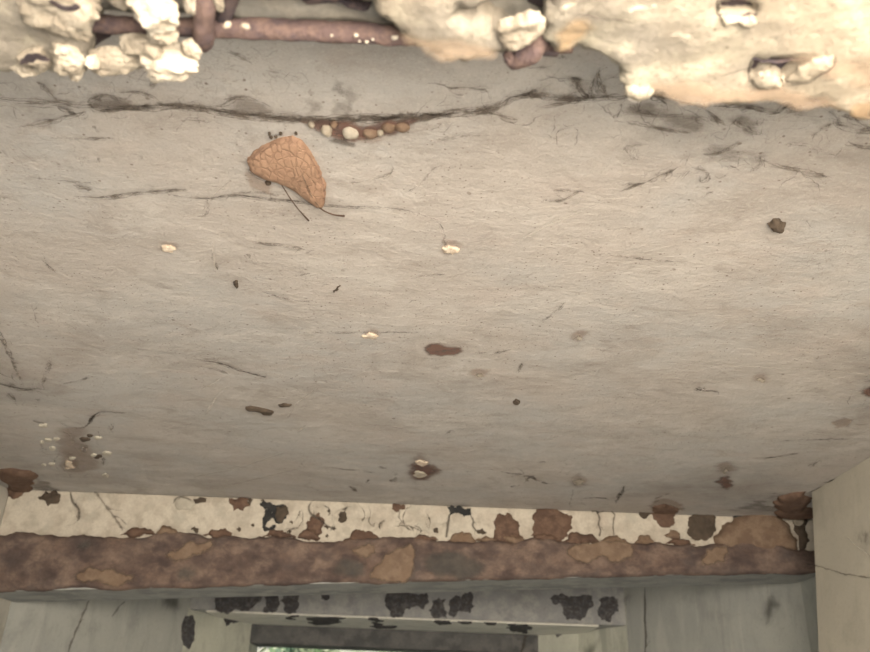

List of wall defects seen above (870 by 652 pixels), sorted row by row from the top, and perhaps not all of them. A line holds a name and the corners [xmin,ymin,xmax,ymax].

spalling [9,0,418,83]
spalling [488,0,574,70]
rust [425,344,462,356]
peeling [191,497,293,538]
spalling [306,509,347,538]
spalling [433,505,573,543]
spalling [639,504,716,541]
rust [0,532,815,593]
peeling [214,595,346,626]
peeling [368,592,474,629]
peeling [550,593,619,622]
crack [641,595,649,651]